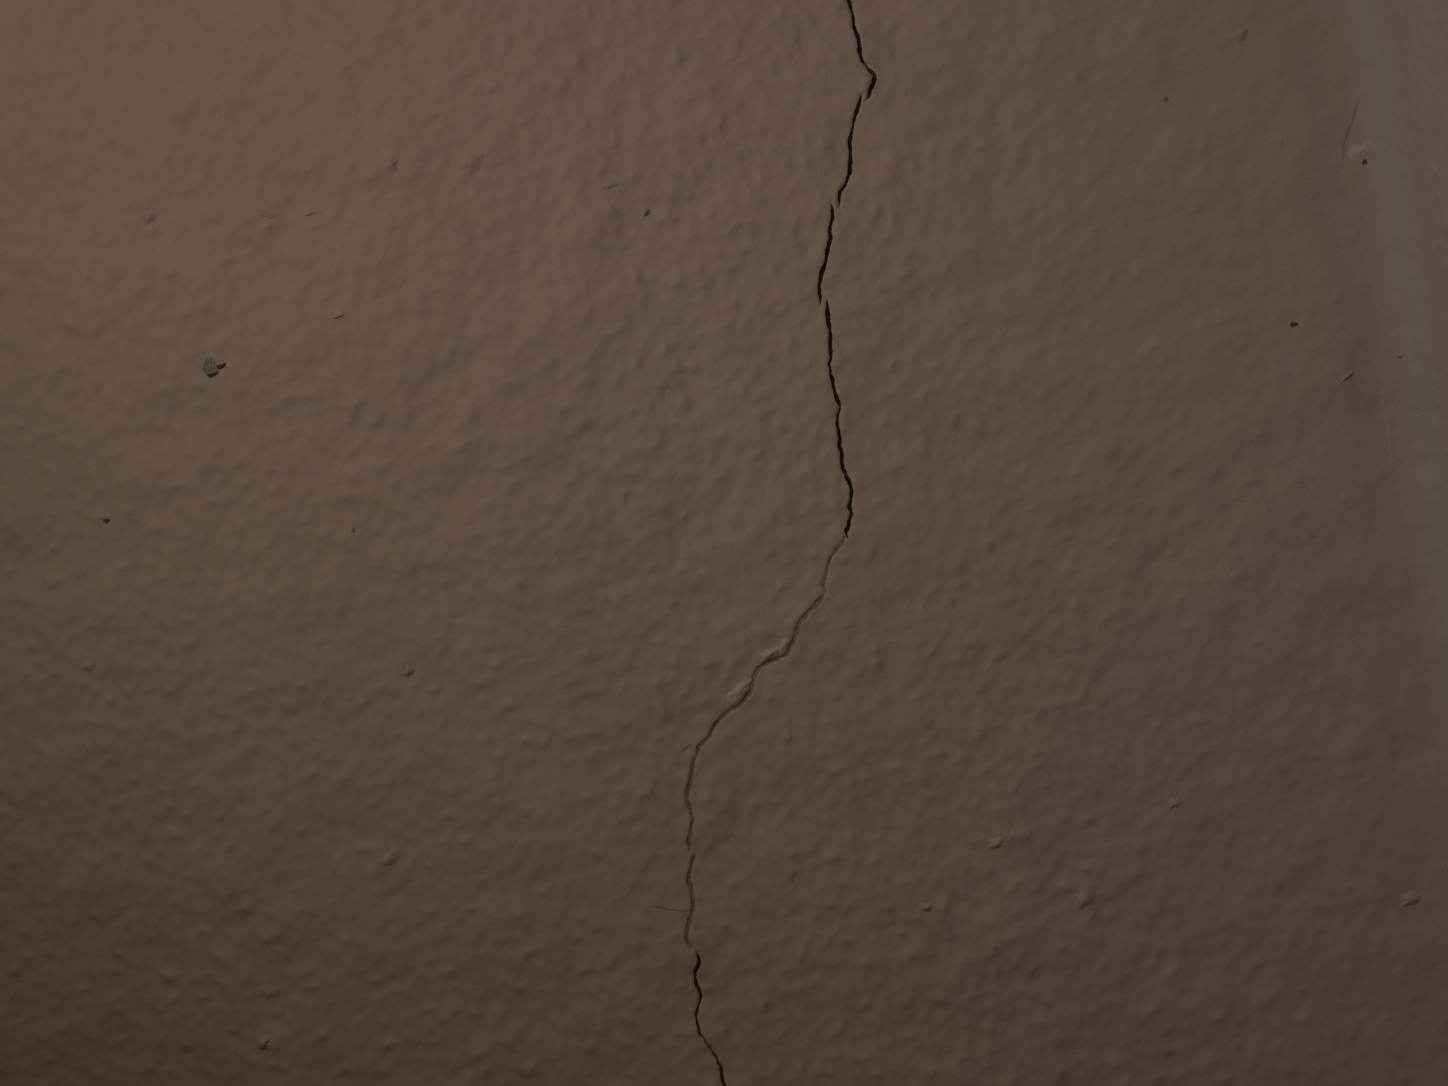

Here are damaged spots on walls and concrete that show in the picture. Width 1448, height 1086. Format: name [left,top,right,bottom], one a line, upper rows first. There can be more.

crack [652,0,877,1086]